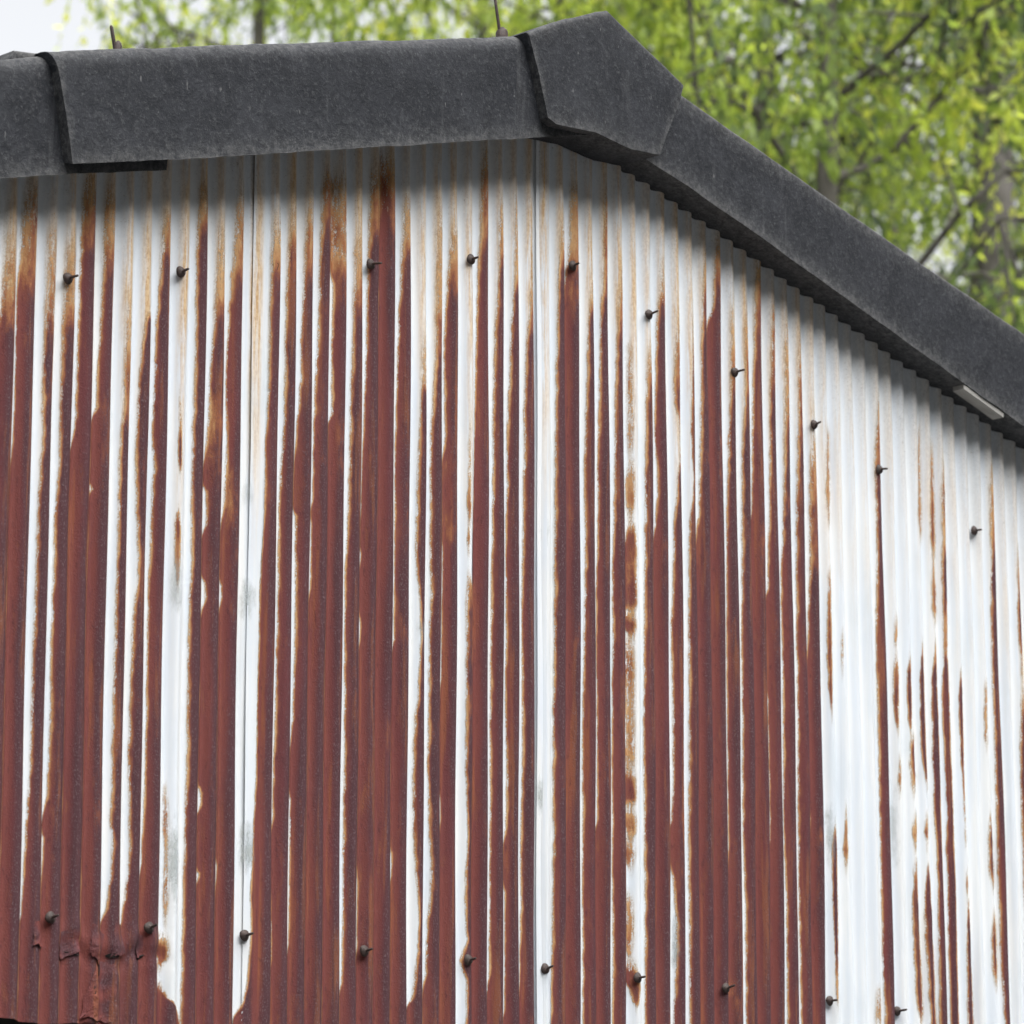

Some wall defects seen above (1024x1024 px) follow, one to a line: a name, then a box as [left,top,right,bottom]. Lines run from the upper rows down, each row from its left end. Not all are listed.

rust [0,150,535,1024]
rust [551,187,849,1024]
rust [874,404,974,1024]
rust [984,467,1010,1024]